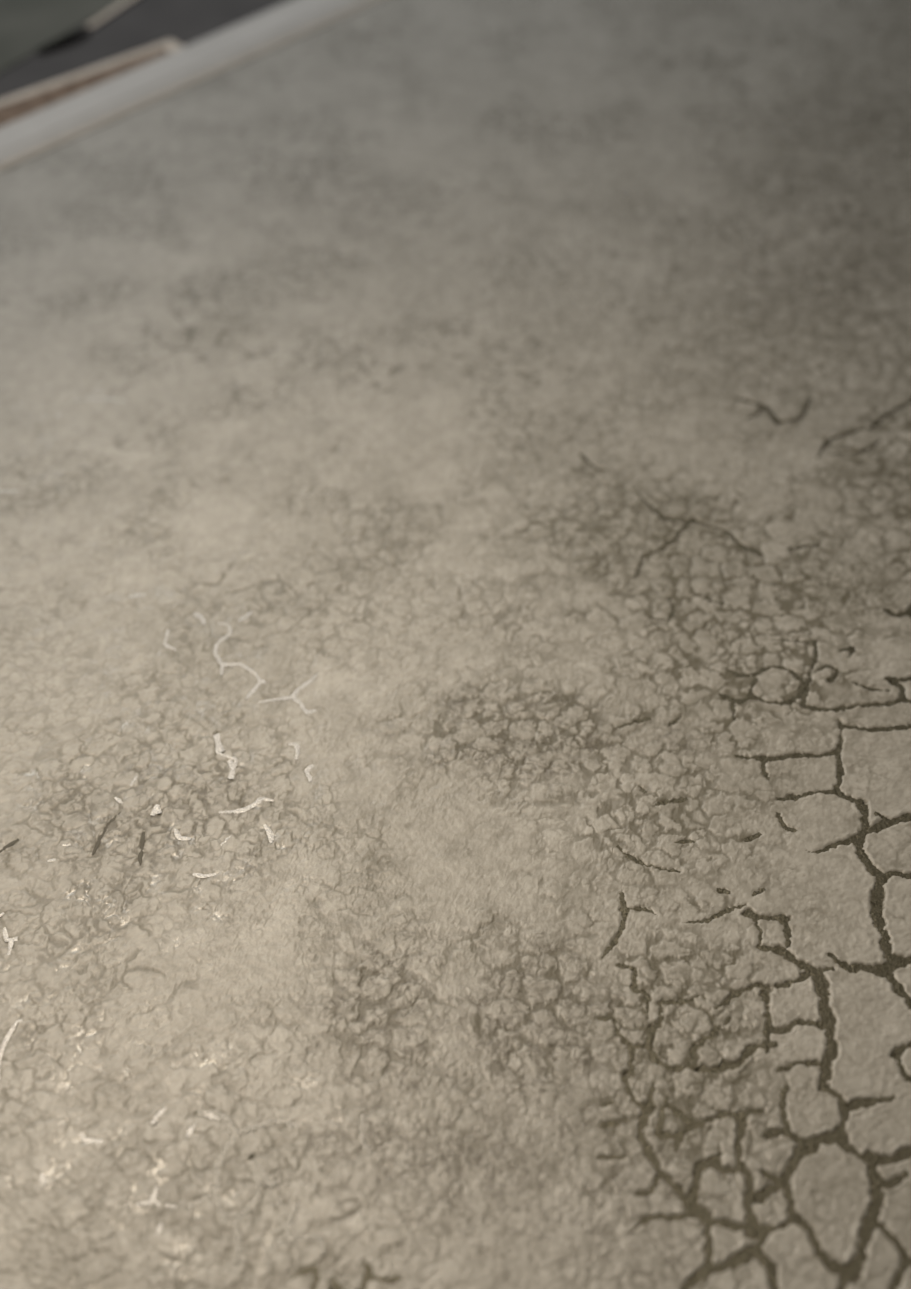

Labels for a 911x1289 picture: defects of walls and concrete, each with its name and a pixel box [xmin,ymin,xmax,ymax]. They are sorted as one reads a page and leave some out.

crack [649,594,733,622]
crack [883,605,911,618]
crack [163,612,318,782]
crack [47,733,274,878]
crack [595,639,911,1289]
crack [39,1173,47,1185]
crack [79,1132,103,1144]
crack [136,1107,402,1289]